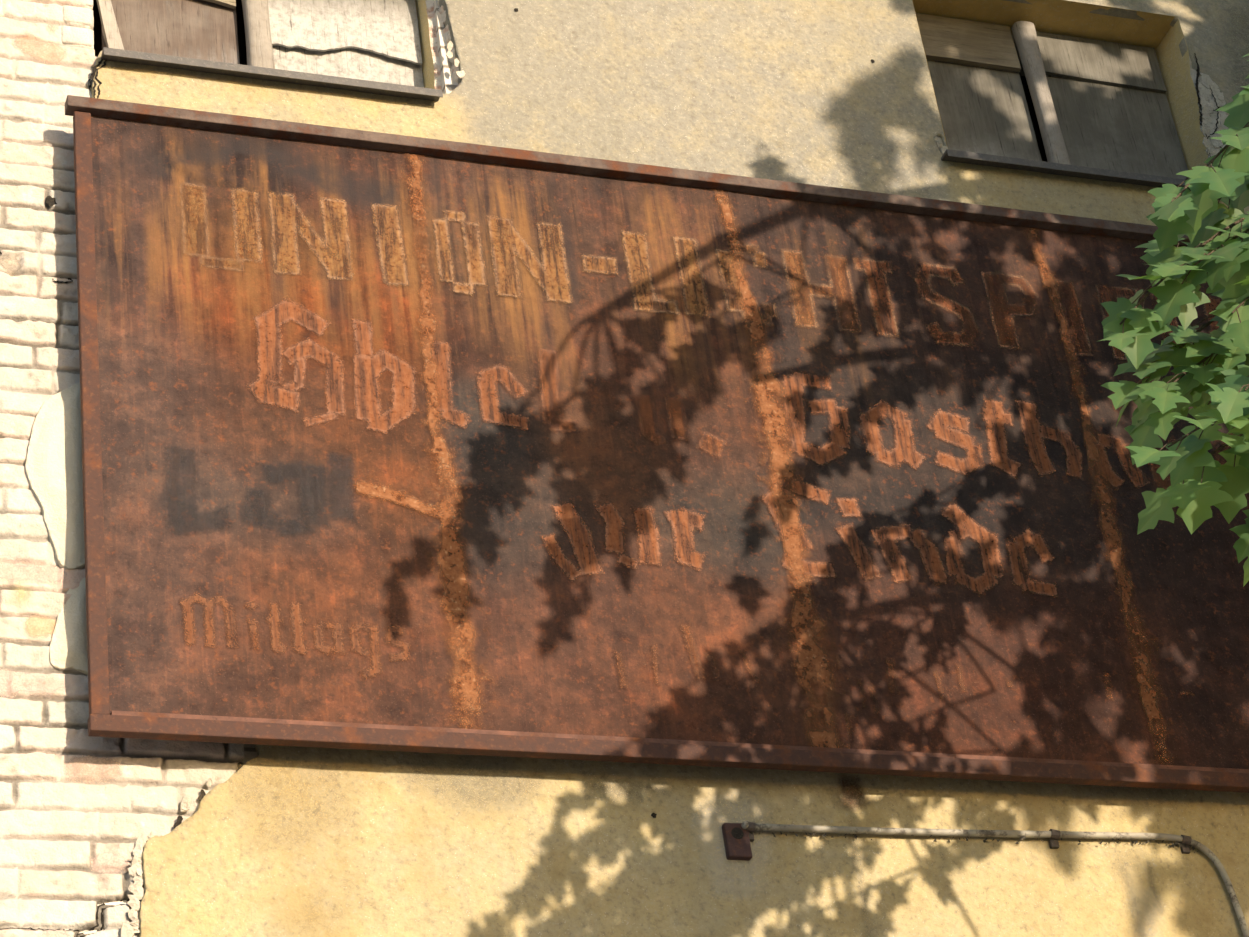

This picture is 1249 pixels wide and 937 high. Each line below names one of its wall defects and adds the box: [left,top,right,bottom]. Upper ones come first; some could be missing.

spalling [425,0,465,90]
peeling [1189,57,1229,167]
peeling [0,556,62,581]
peeling [0,671,62,696]
peeling [66,757,118,782]
crack [173,789,206,829]
spalling [91,831,157,937]
crack [3,899,140,937]